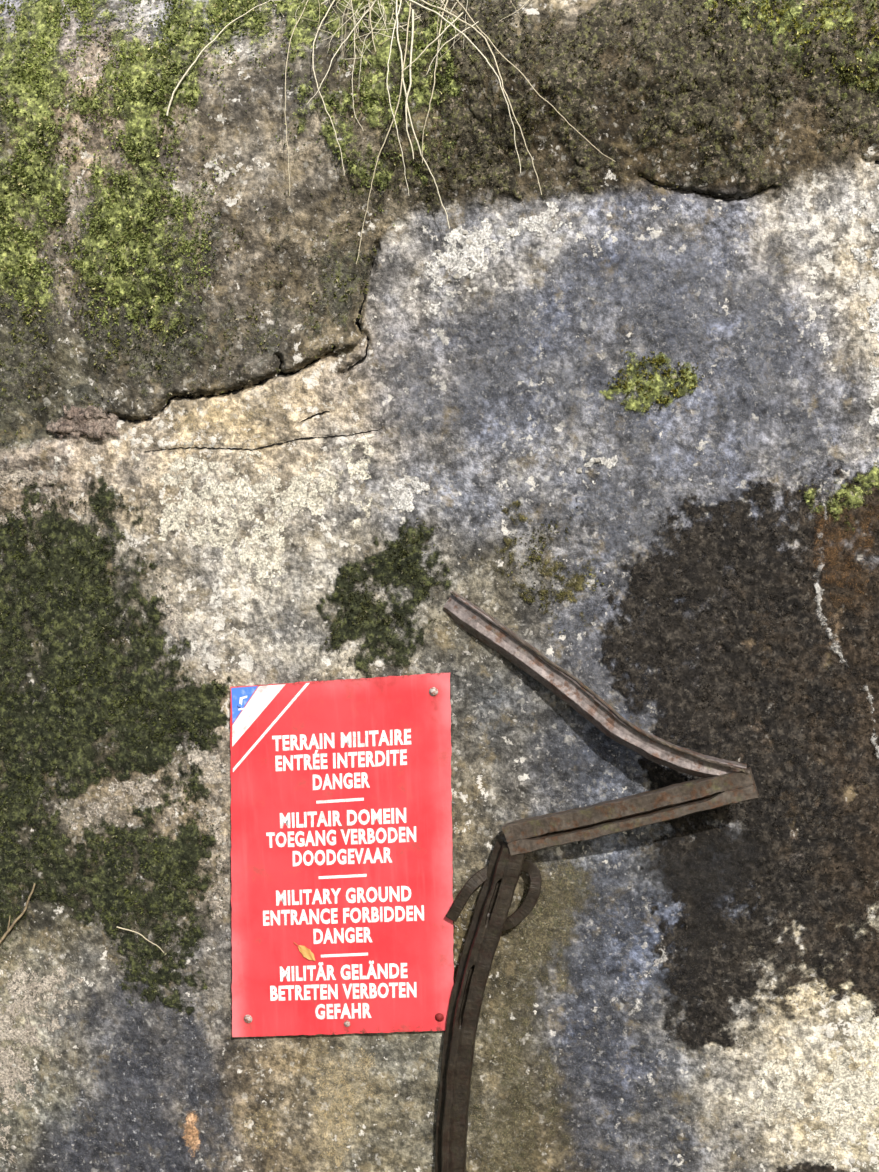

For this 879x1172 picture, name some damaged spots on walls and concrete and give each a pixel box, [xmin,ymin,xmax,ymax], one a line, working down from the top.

crack [118,257,375,423]
crack [144,411,382,452]